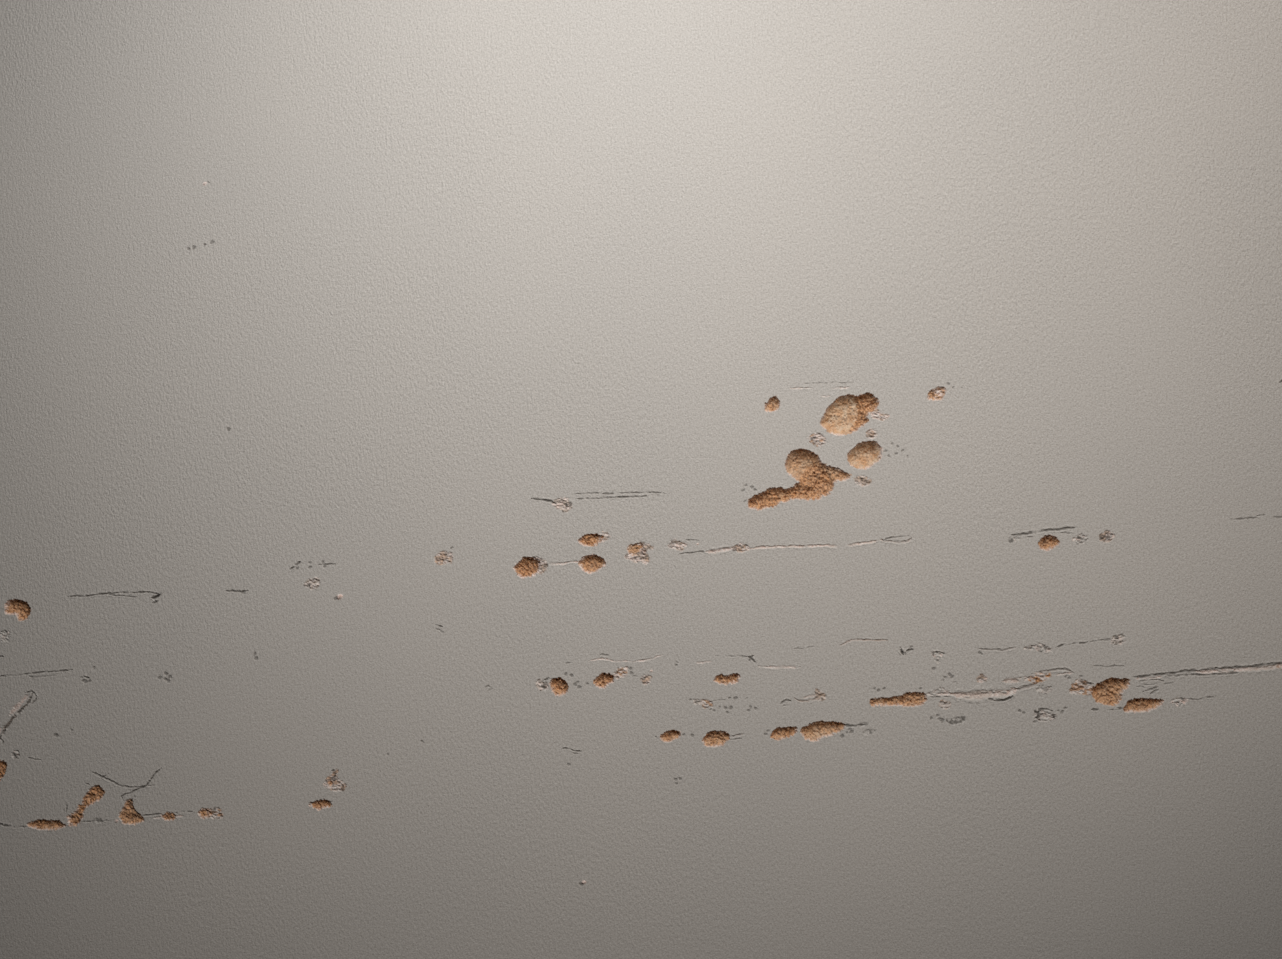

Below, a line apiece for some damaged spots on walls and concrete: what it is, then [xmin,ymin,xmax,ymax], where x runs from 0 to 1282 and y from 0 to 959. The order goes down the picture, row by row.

spalling [741,391,890,511]
spalling [513,556,549,579]
spalling [577,531,612,574]
spalling [1038,530,1116,552]
spalling [0,598,32,658]
spalling [535,666,654,697]
spalling [1068,664,1216,714]
spalling [763,686,928,743]
spalling [655,729,747,749]
spalling [0,750,42,782]
spalling [26,783,106,831]